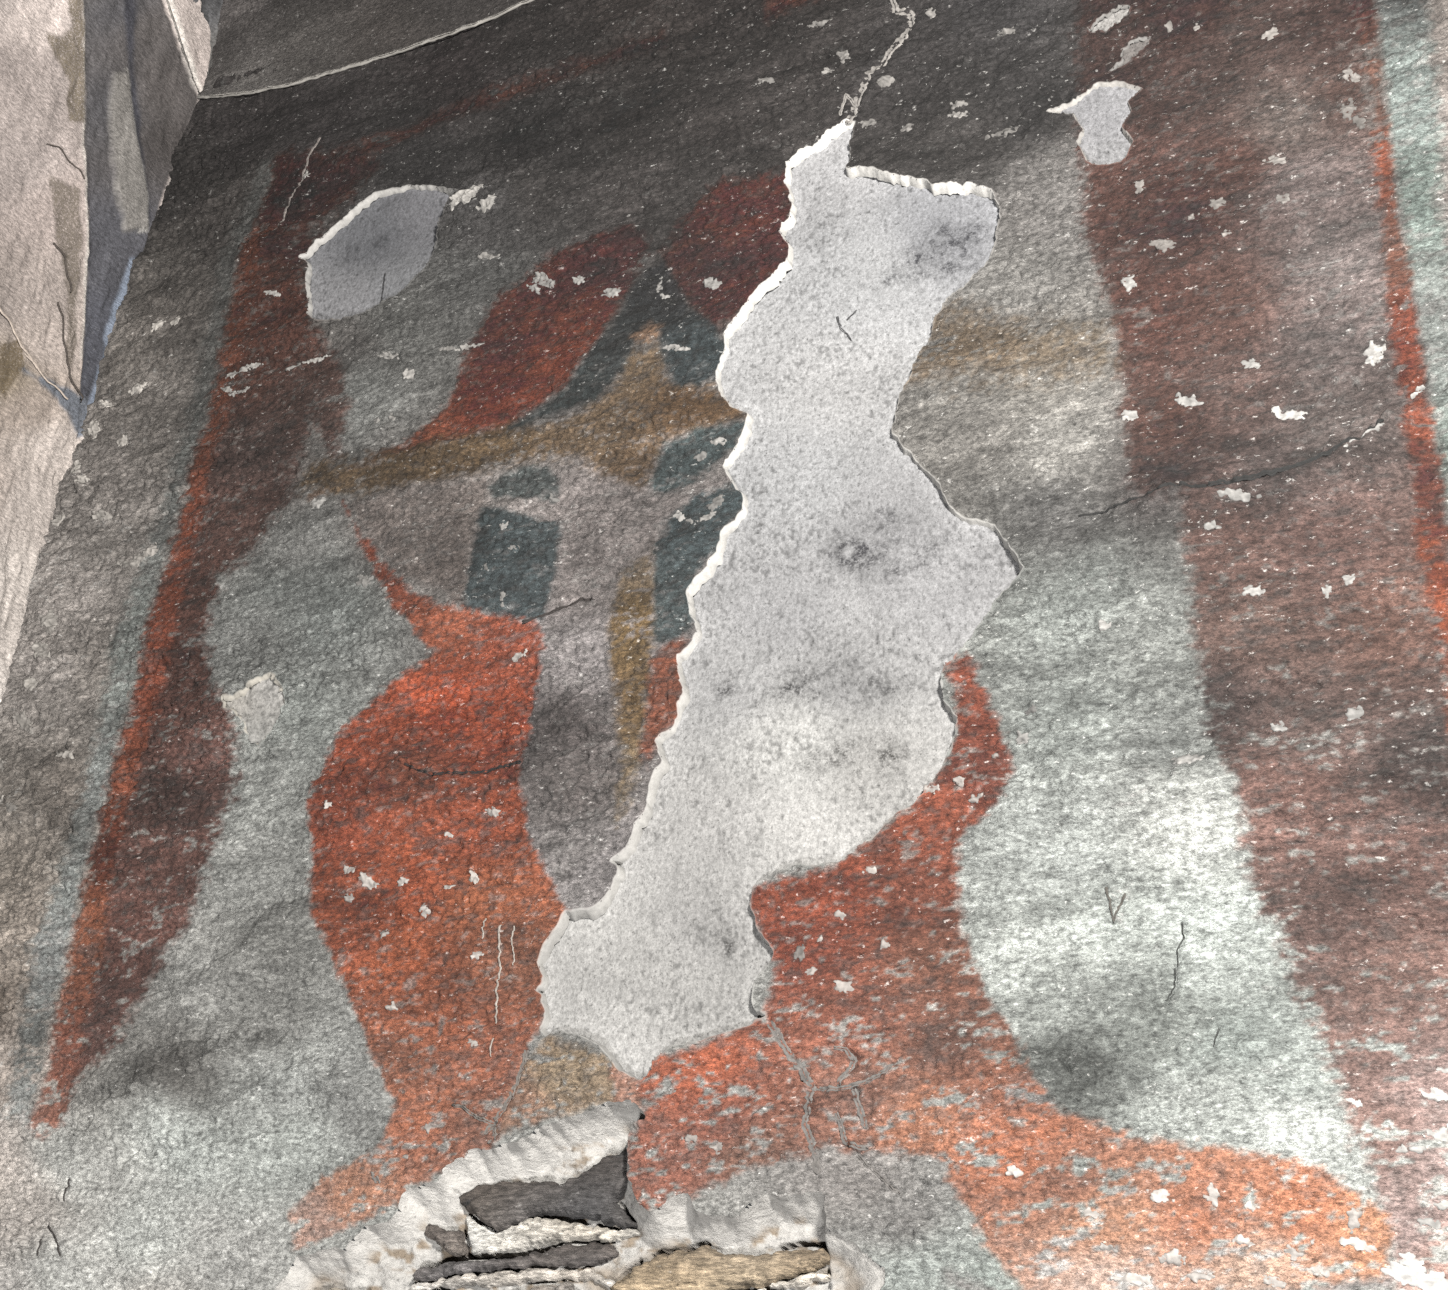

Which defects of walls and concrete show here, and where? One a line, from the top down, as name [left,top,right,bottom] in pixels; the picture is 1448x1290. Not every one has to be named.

crack [839,0,915,124]
flaking render [1045,21,1173,167]
peeling [1086,4,1133,33]
flaking render [298,184,497,322]
peeling [1174,392,1204,407]
peeling [1271,406,1308,420]
peeling [1363,340,1386,366]
crack [1078,419,1384,517]
peeling [1217,488,1262,502]
flaking render [535,118,1025,1082]
peeling [220,671,287,748]
flaking render [274,1100,885,1290]